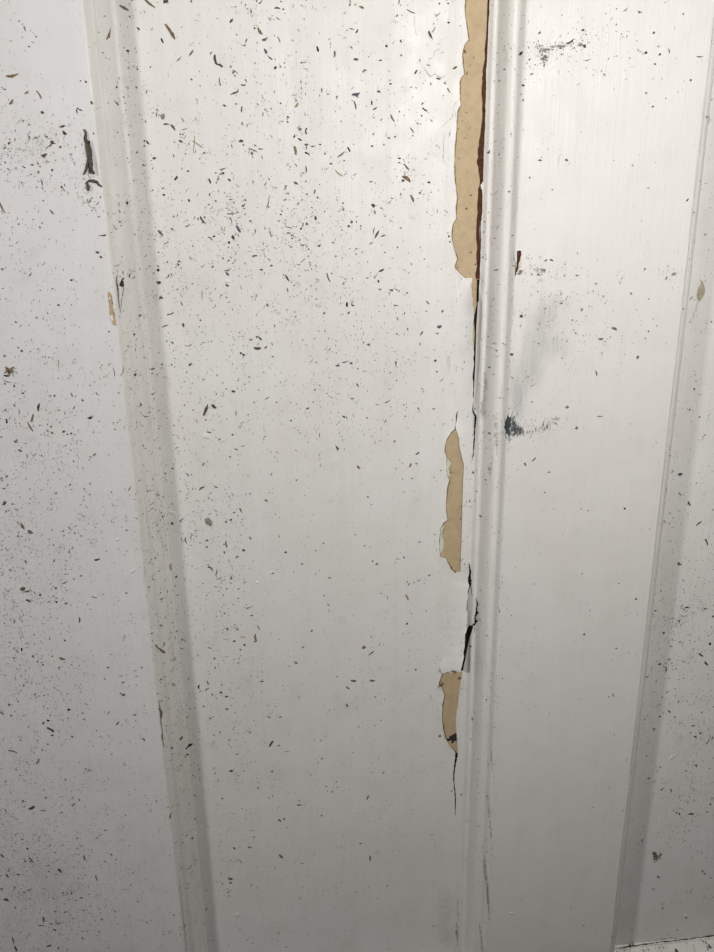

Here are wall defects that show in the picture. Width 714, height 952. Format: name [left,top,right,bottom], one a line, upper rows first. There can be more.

peeling [445,0,495,345]
peeling [433,424,469,756]
crack [451,278,480,671]
crack [451,753,459,815]